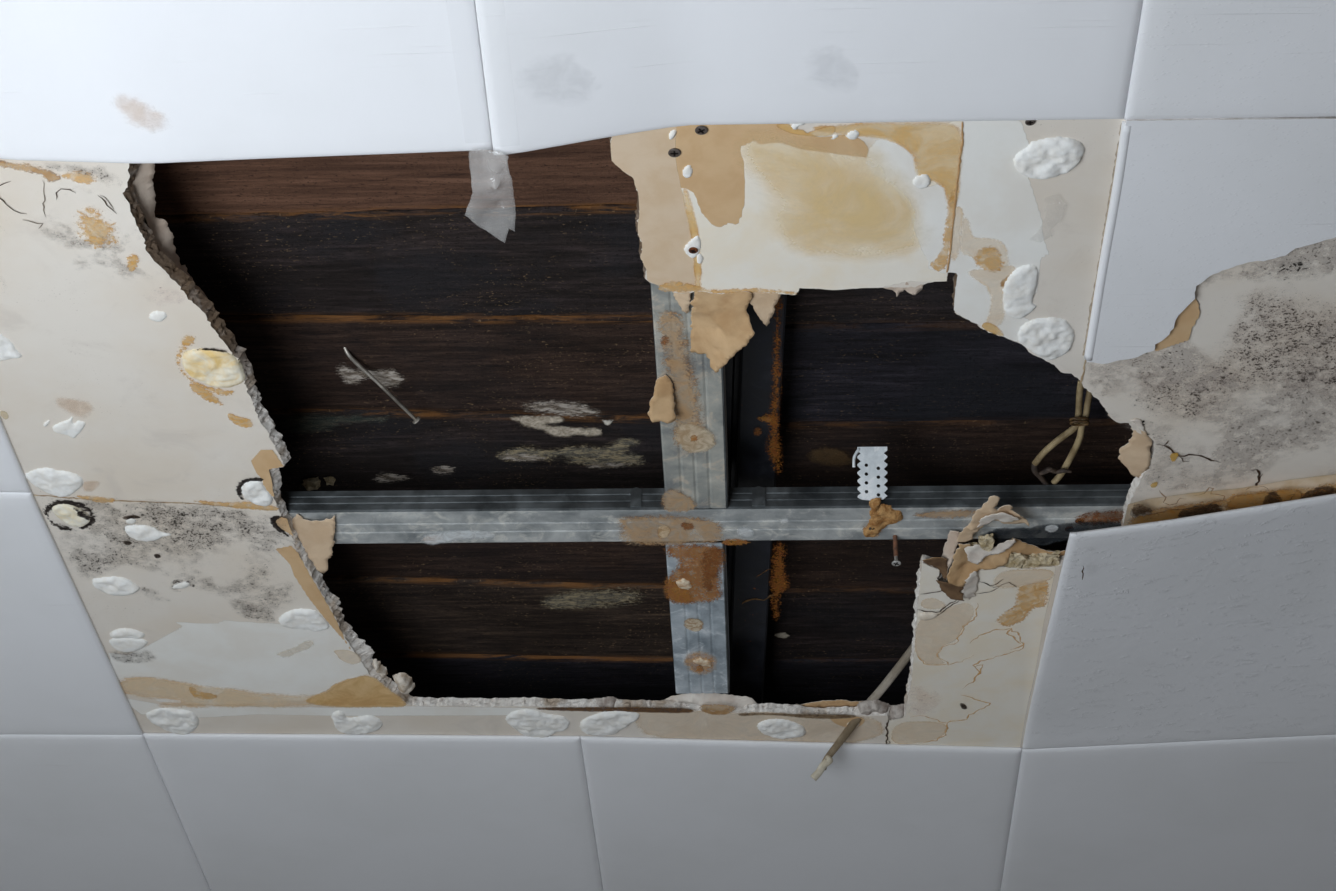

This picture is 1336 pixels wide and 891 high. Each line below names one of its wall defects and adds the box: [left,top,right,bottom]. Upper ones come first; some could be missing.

leakage [0,161,118,184]
leakage [44,208,146,276]
peeling [681,120,1049,342]
leakage [754,123,1013,335]
leakage [1242,240,1336,280]
leakage [177,336,252,428]
rust [754,299,783,473]
leakage [1095,292,1336,525]
leakage [43,478,289,620]
rust [742,541,790,618]
peeling [108,620,693,718]
peeling [739,563,1056,747]